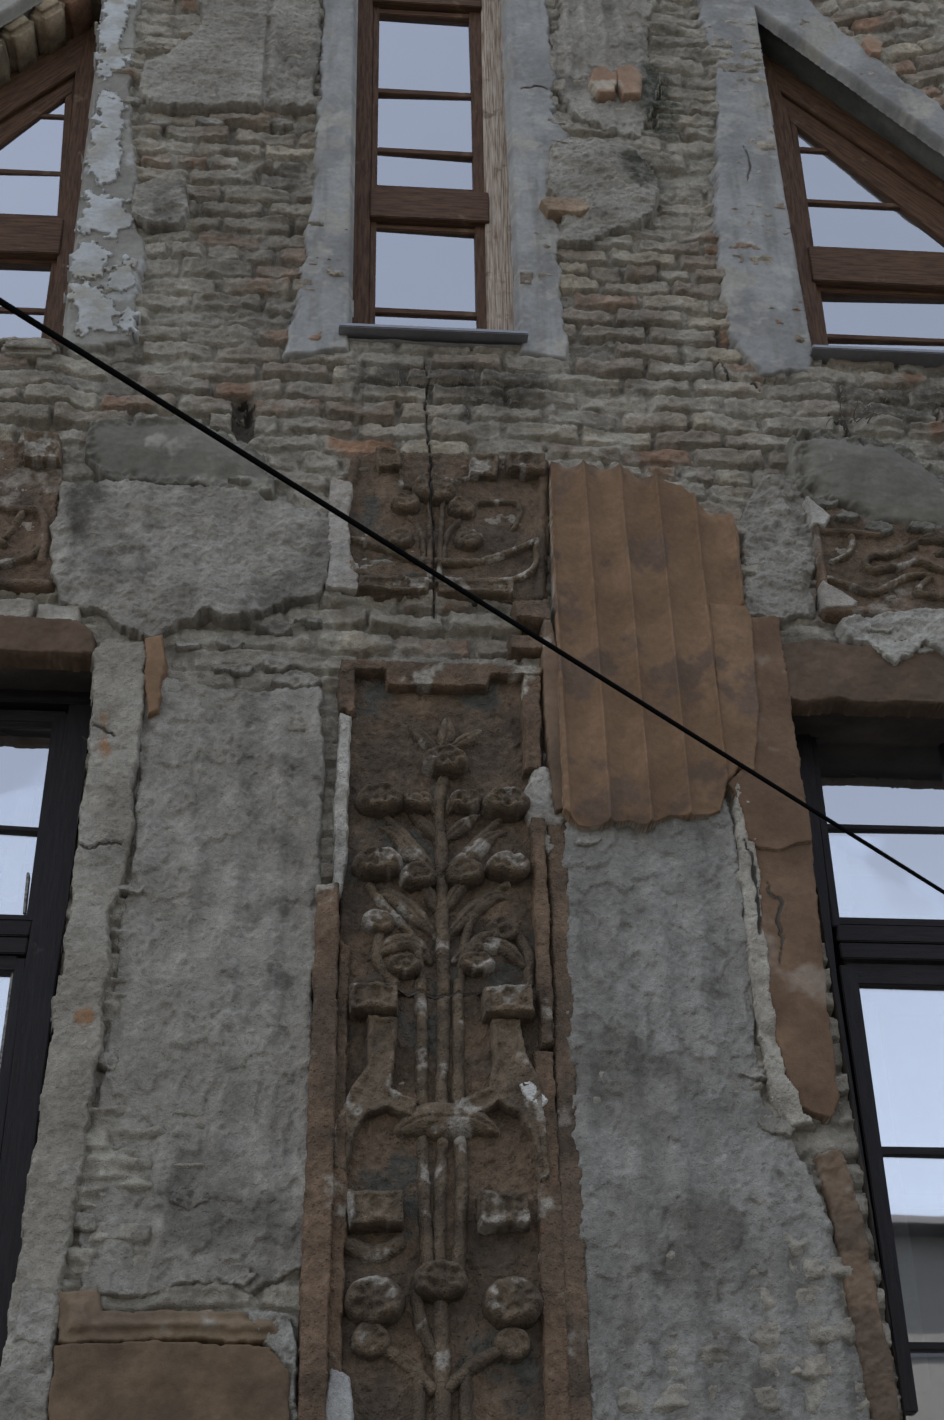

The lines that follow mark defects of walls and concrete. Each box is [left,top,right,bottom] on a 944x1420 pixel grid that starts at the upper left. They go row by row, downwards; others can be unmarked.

peeling [63,0,141,344]
crack [423,362,436,619]
spalling [739,474,944,666]
crack [82,724,114,740]
crack [80,841,122,850]